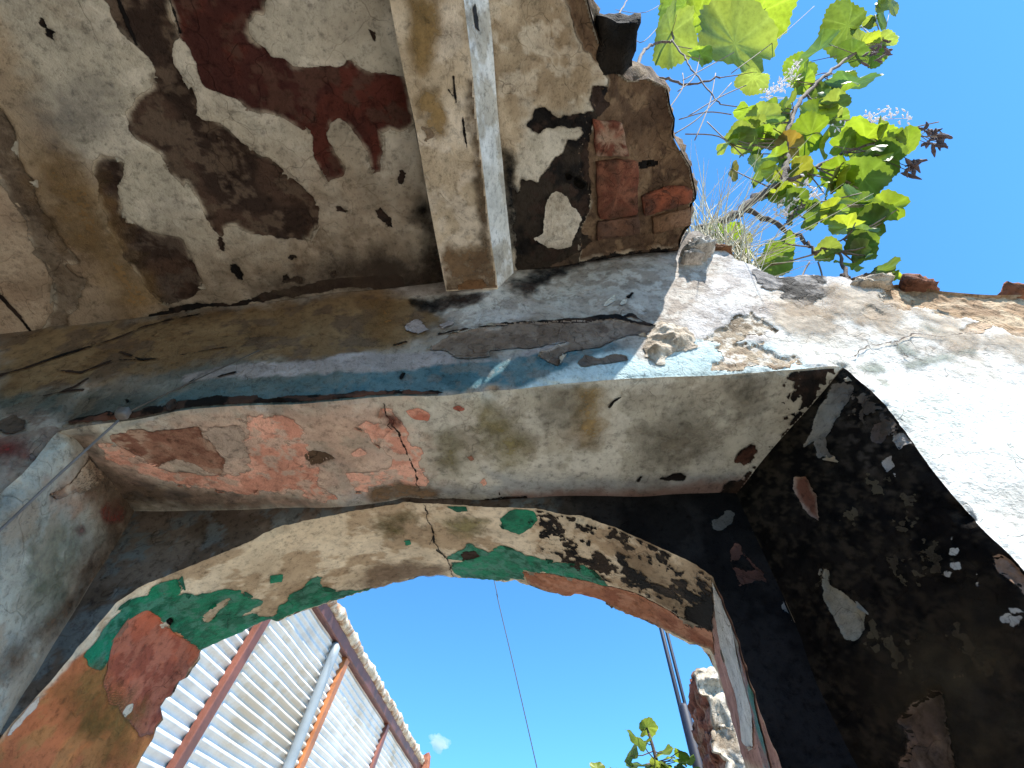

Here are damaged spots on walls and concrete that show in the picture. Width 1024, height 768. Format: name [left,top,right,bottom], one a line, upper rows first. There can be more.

spalling [565,0,601,62]
spalling [534,61,732,265]
crack [0,276,404,396]
peeling [405,319,653,366]
peeling [84,576,371,737]
peeling [50,373,443,503]
crack [383,403,521,577]
peeling [500,509,537,535]
leakage [528,510,715,642]
peeling [818,569,868,641]
peeling [803,376,912,475]
peeling [1000,608,1022,627]